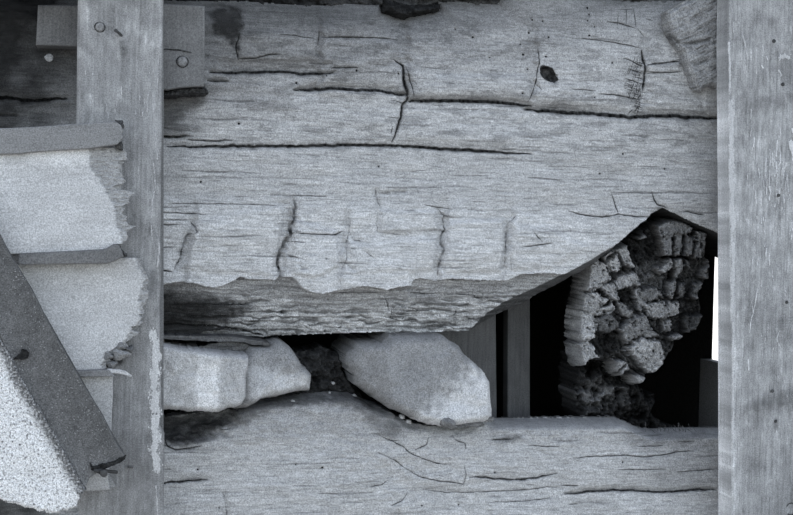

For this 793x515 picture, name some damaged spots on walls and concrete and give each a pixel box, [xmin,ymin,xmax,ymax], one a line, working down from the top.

damp [211,6,244,50]
crack [164,8,717,154]
crack [378,434,715,502]